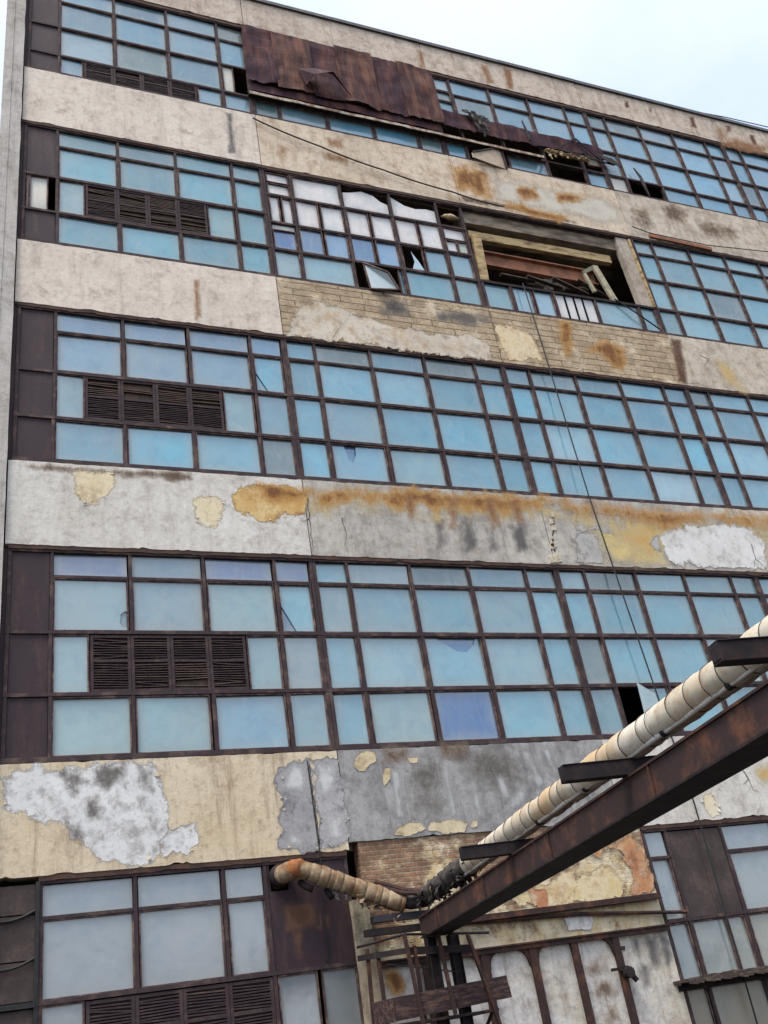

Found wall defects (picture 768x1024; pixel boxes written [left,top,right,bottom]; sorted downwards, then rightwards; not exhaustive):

rust [452,166,492,198]
rust [506,186,580,223]
peeling [285,300,543,362]
rust [559,321,573,357]
rust [591,340,626,370]
peeling [192,483,309,528]
rust [307,487,768,558]
peeling [573,511,767,571]
peeling [0,758,199,869]
peeling [273,756,351,855]
peeling [394,818,478,836]
flaking render [513,834,654,931]